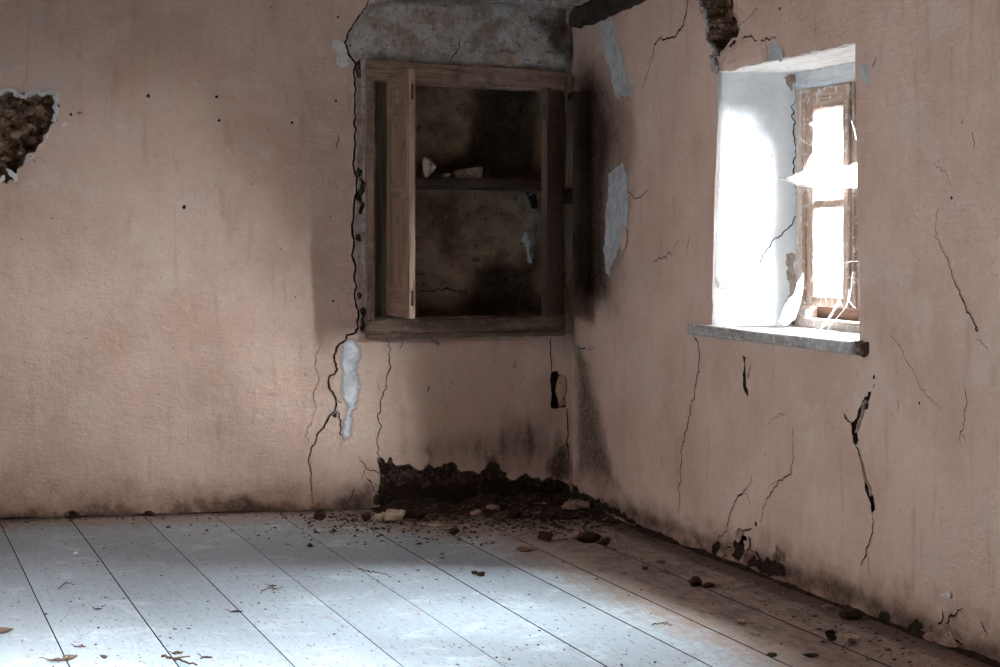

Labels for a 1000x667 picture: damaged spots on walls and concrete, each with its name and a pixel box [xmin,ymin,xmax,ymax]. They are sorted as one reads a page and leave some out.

flaking render [698,0,741,74]
flaking render [0,87,67,184]
peeling [332,39,367,437]
crack [304,0,403,504]
peeling [603,163,629,276]
crack [934,206,989,354]
flaking render [550,371,567,409]
crack [662,335,701,523]
crack [726,412,794,533]
crack [844,384,875,575]
flaking render [711,527,758,561]
damp [725,546,800,578]